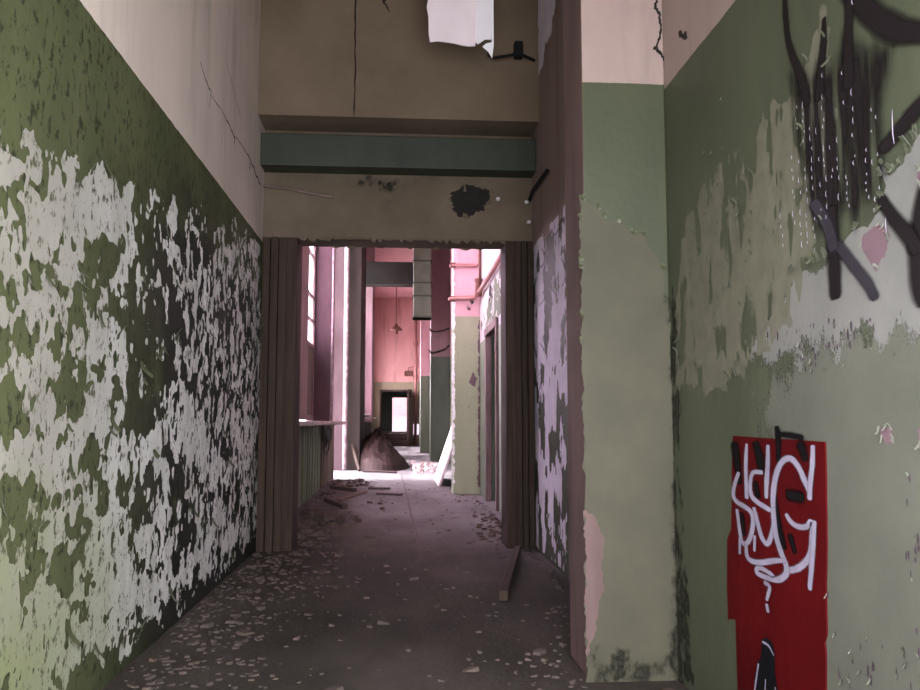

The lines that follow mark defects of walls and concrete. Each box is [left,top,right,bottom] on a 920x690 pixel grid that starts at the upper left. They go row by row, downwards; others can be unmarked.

crack [653,0,664,62]
peeling [0,128,265,690]
peeling [531,205,569,571]
peeling [578,4,920,690]